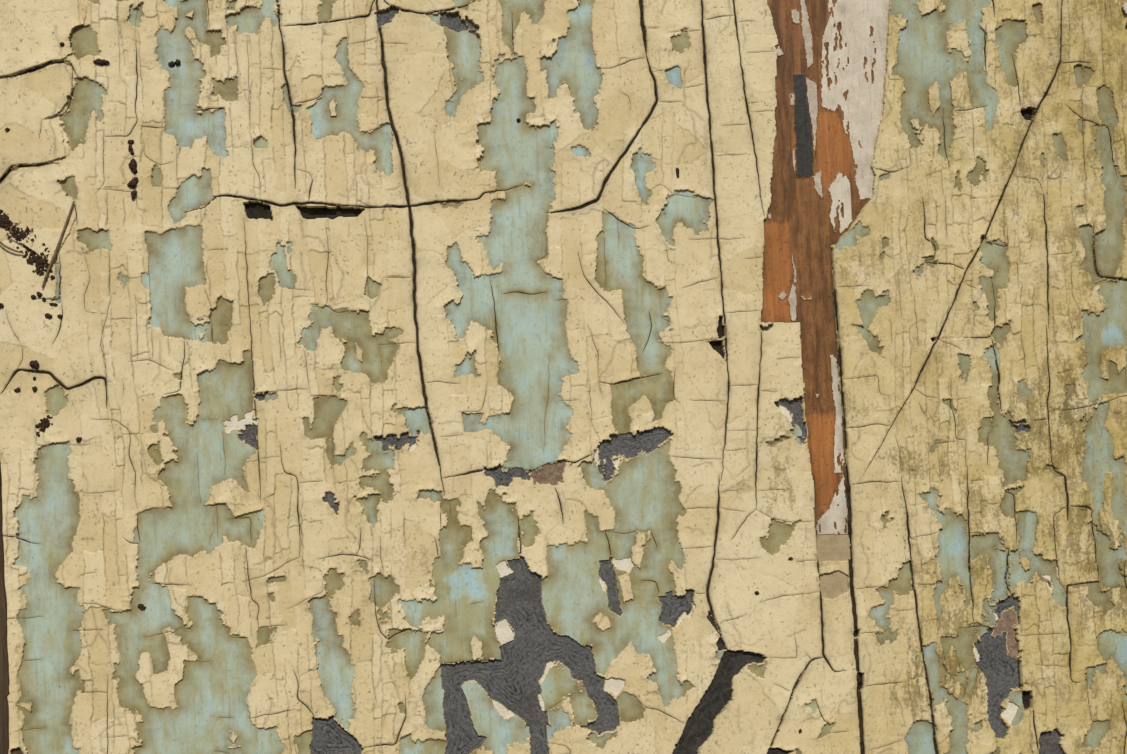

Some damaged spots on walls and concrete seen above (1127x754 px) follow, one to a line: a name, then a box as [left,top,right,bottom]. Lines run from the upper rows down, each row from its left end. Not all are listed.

crack [0,162,59,183]
crack [0,60,75,136]
peeling [12,442,85,754]
crack [0,251,185,544]
peeling [155,0,282,158]
peeling [103,350,363,754]
peeling [297,277,430,528]
crack [184,0,815,651]
peeling [358,0,767,754]
peeling [760,0,1042,599]
crack [763,0,1127,754]
peeling [905,65,1127,754]